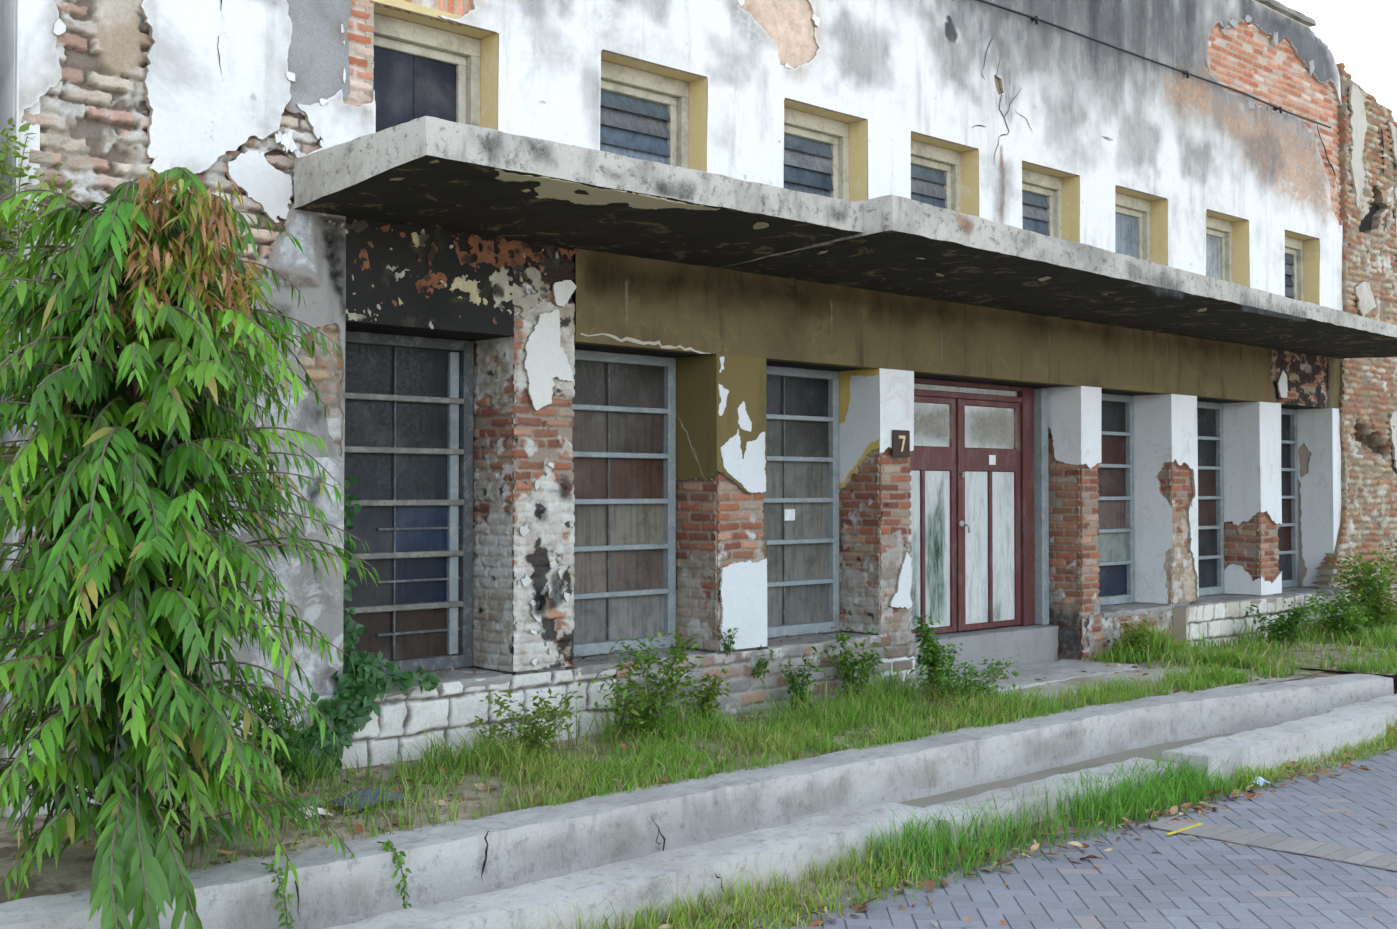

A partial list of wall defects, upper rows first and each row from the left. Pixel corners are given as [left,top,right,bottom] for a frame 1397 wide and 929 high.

spalling [15,0,472,308]
peeling [494,169,720,210]
water stain [658,183,691,198]
water stain [969,0,1335,204]
spalling [1205,15,1341,224]
spalling [1359,196,1380,232]
spalling [298,220,577,672]
spalling [676,356,767,651]
spalling [839,374,912,637]
spalling [1158,461,1196,604]
spalling [1224,504,1280,582]
crack [481,831,489,878]